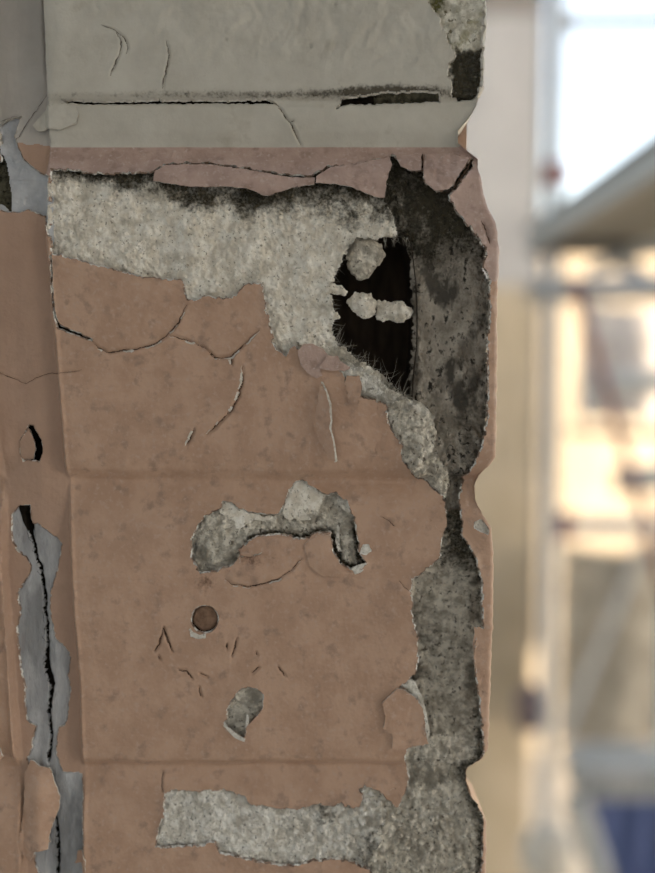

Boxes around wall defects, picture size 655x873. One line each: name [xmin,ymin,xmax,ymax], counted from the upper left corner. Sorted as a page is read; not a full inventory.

crack [103,25,128,76]
crack [68,42,301,145]
crack [337,92,439,109]
spalling [428,0,484,96]
water stain [55,156,485,267]
crack [55,305,260,446]
spalling [47,154,490,873]
peeling [20,760,61,862]